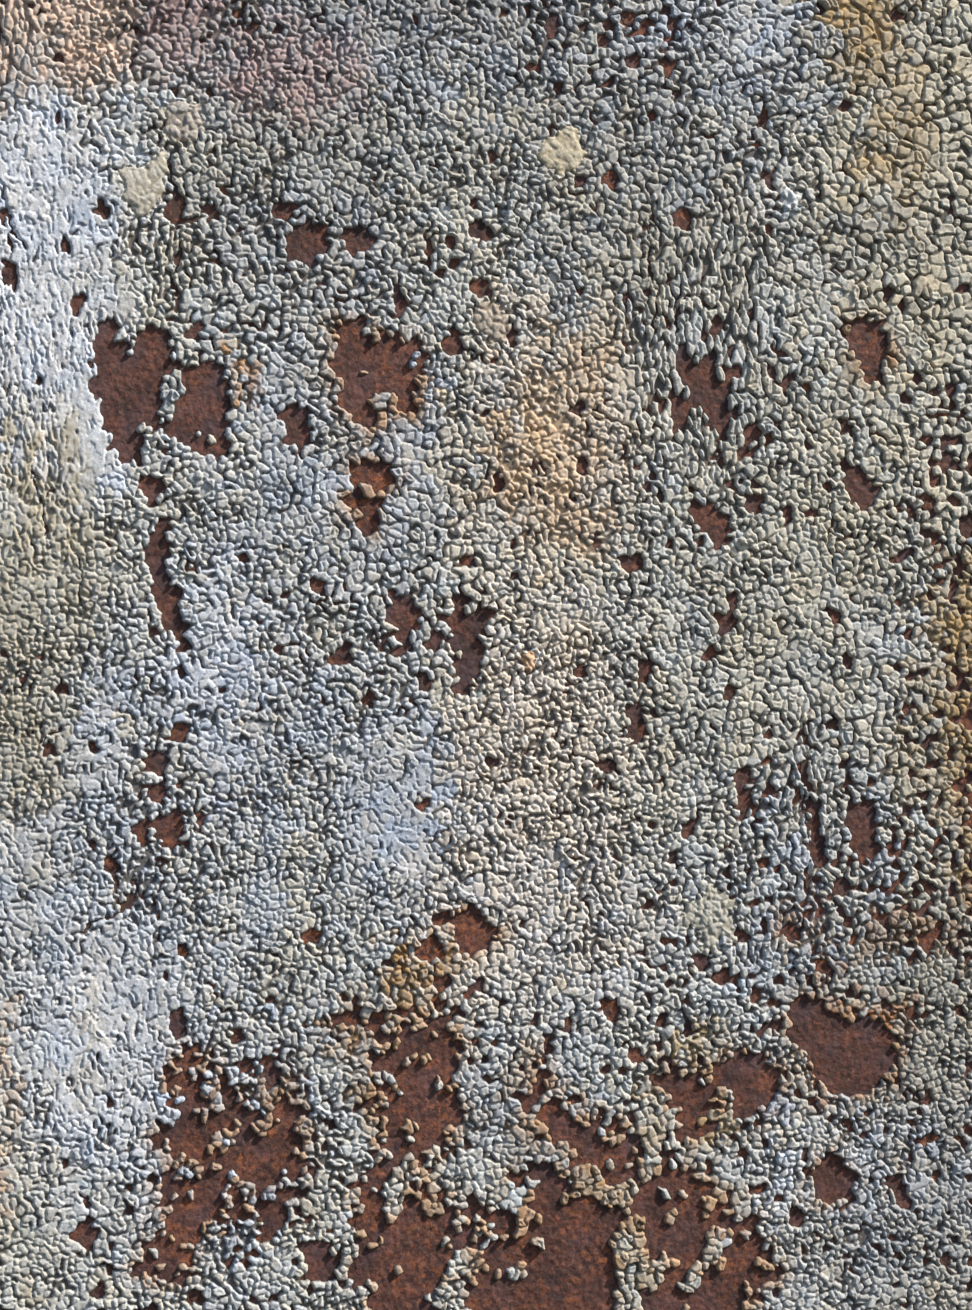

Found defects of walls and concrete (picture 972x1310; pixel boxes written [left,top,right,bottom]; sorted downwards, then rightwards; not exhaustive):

crack [3,186,26,251]
crack [168,166,219,318]
crack [645,182,690,340]
peeling [905,122,972,345]
peeling [613,197,972,712]
peeling [559,645,687,782]
corrosion [935,599,972,731]
crack [80,870,136,932]
peeling [713,724,787,886]
crack [791,724,815,889]
peeling [790,699,972,967]
peeling [22,886,972,1310]